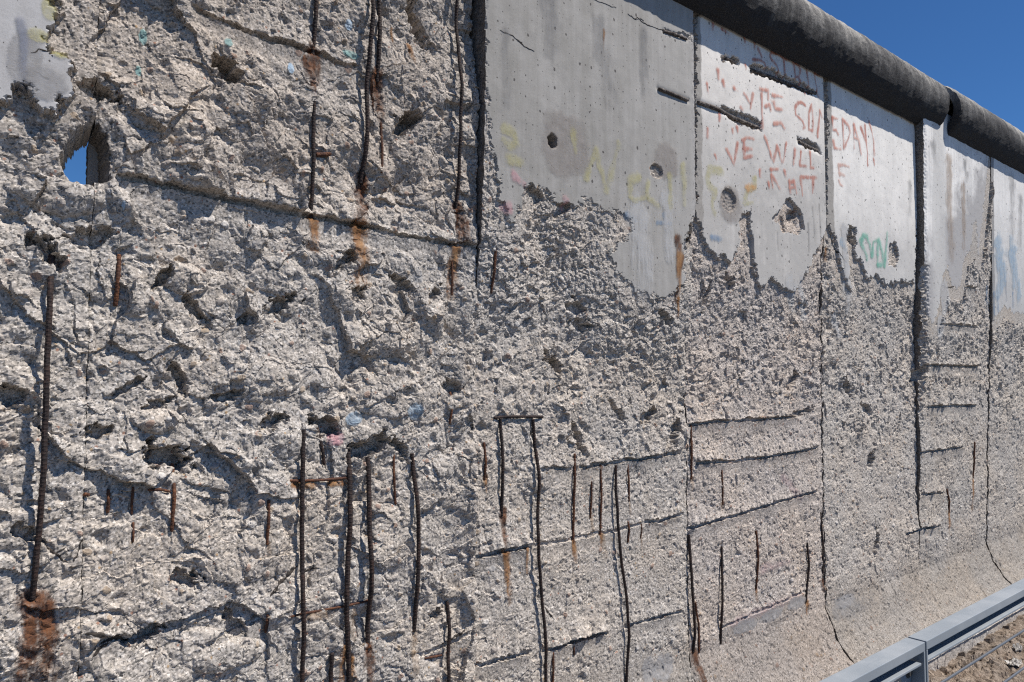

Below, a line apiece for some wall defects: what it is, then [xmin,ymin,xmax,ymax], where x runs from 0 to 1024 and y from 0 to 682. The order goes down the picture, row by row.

rust [303,45,321,87]
spalling [662,11,699,199]
spalling [720,105,762,133]
spalling [797,77,830,154]
rust [349,175,370,284]
rust [675,234,684,312]
spalling [0,0,99,682]
spalling [78,0,480,682]
spalling [472,111,1024,682]
rust [500,506,511,600]
rust [16,591,59,681]
rust [339,642,375,682]